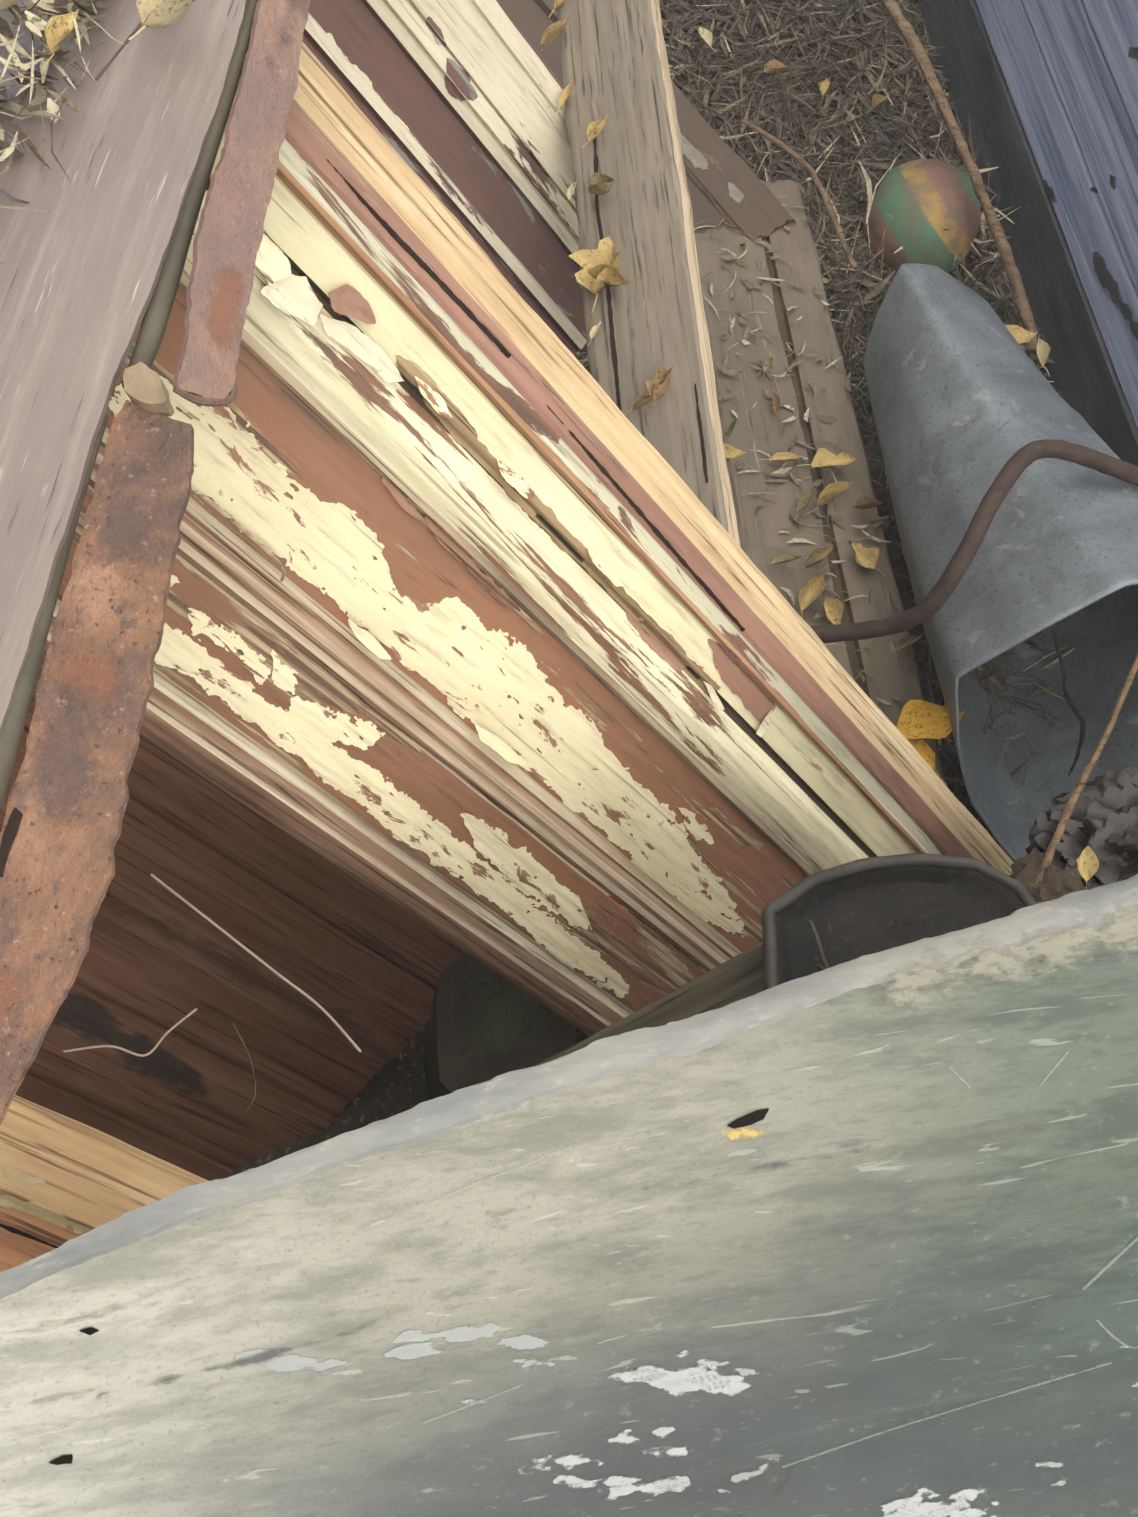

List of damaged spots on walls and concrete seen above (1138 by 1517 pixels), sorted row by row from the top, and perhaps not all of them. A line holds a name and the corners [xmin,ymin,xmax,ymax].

peeling [315,20,381,98]
peeling [426,16,478,101]
peeling [681,132,708,170]
peeling [728,182,744,203]
peeling [255,230,376,325]
peeling [108,382,132,417]
peeling [159,355,776,938]
peeling [154,607,629,998]